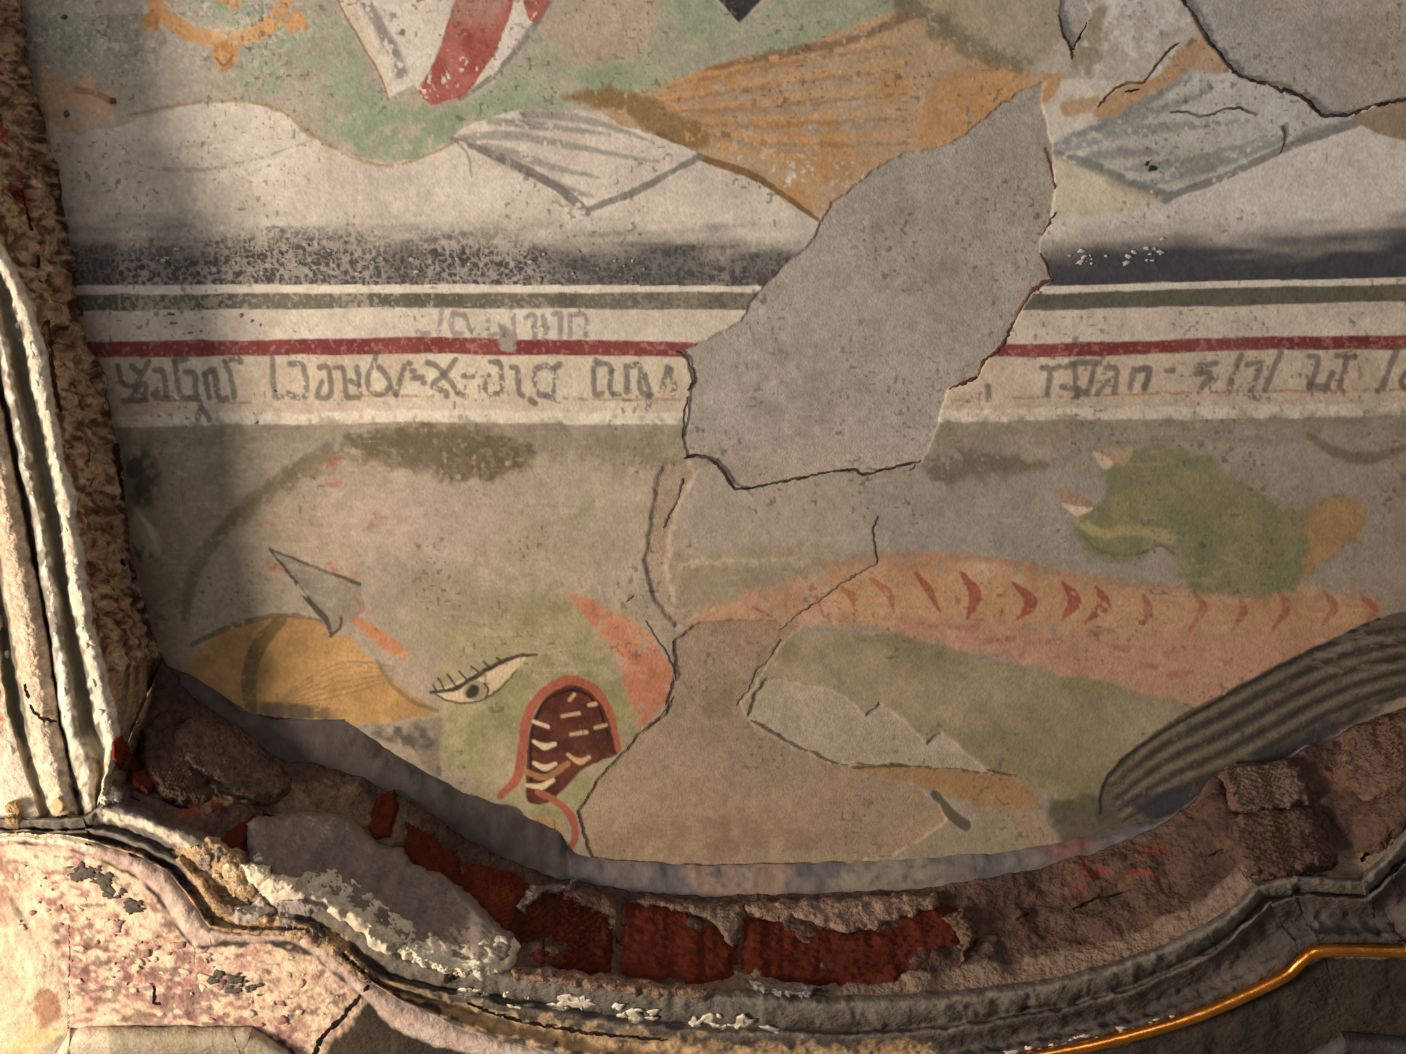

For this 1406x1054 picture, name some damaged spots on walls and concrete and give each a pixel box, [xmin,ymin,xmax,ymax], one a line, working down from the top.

crack [1057,14,1090,60]
crack [1097,0,1406,154]
crack [663,351,920,528]
crack [735,516,878,706]
peeling [18,861,146,962]
crack [312,974,373,1054]
peeling [688,1013,779,1033]